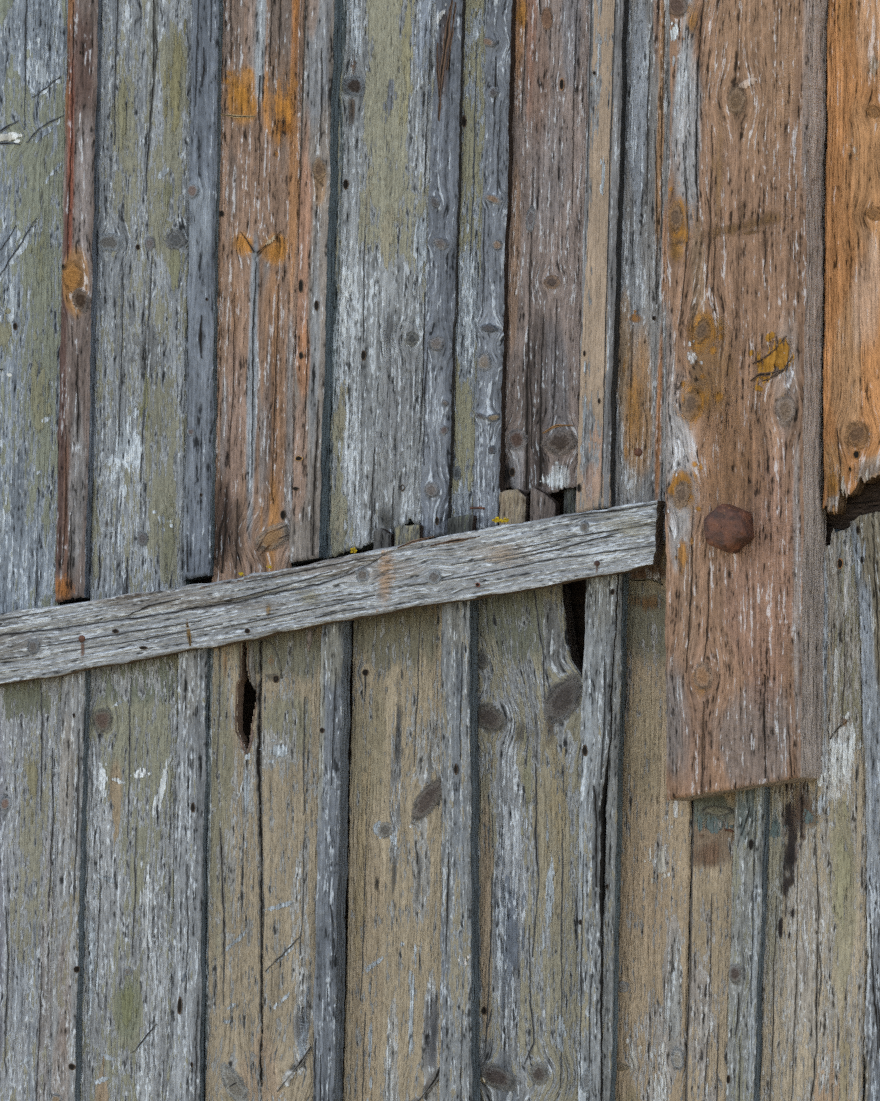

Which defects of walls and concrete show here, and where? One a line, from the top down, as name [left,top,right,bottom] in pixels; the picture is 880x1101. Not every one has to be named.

crack [0,0,656,1101]
crack [646,0,717,326]